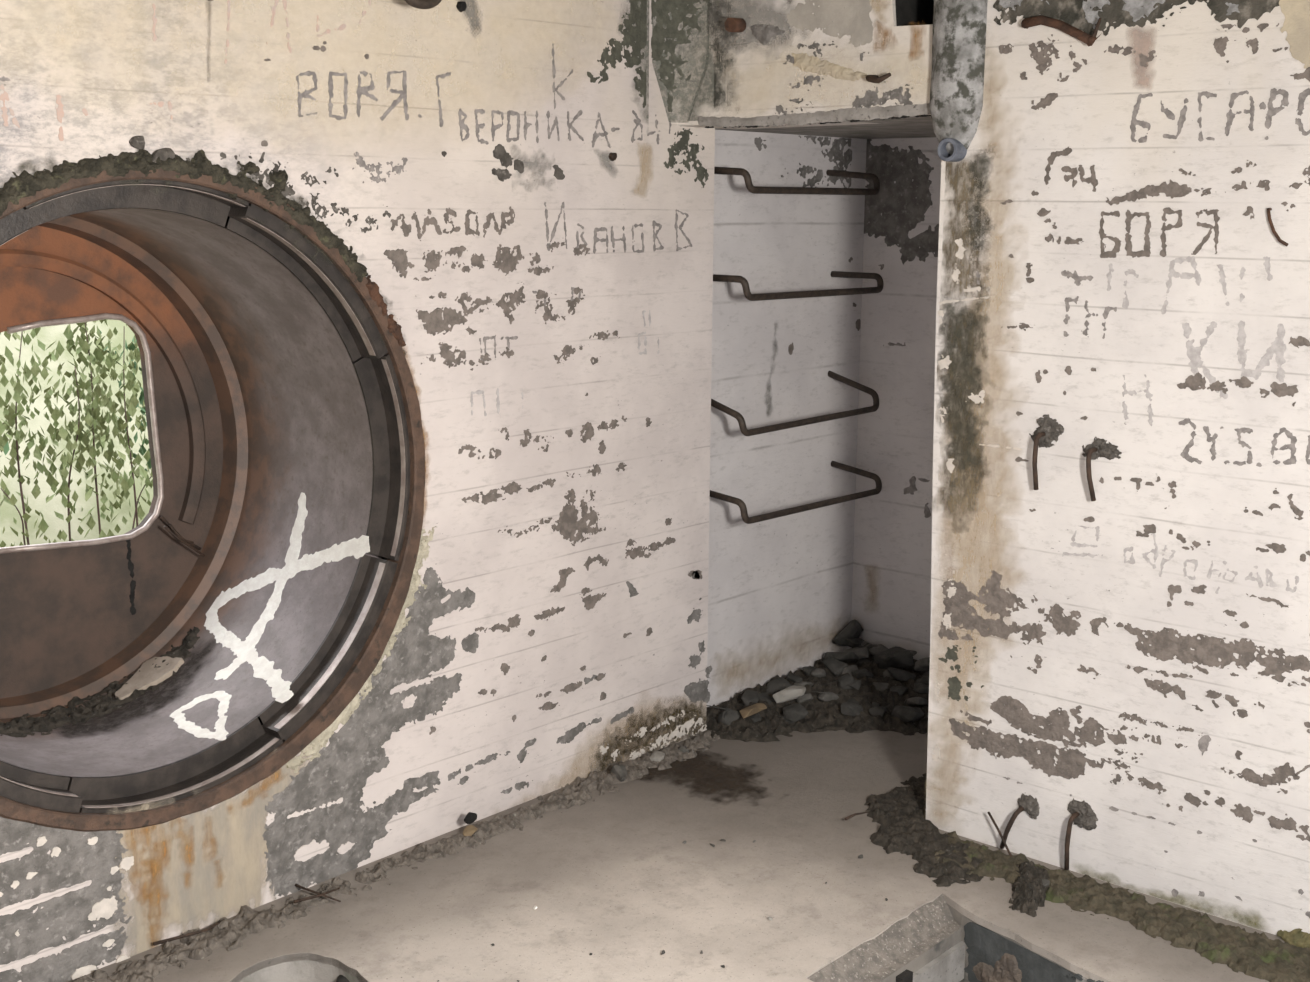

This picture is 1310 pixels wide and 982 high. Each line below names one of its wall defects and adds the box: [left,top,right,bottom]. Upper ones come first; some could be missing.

peeling [587,0,711,113]
rust [1021,15,1102,46]
flaking render [1213,0,1310,82]
peeling [781,136,939,265]
peeling [383,241,590,371]
leakage [937,154,1003,681]
peeling [262,416,634,899]
leakage [576,704,763,802]
peeling [934,570,1310,842]
peeling [0,816,134,982]
rust [115,753,307,957]
leakage [964,922,1076,982]